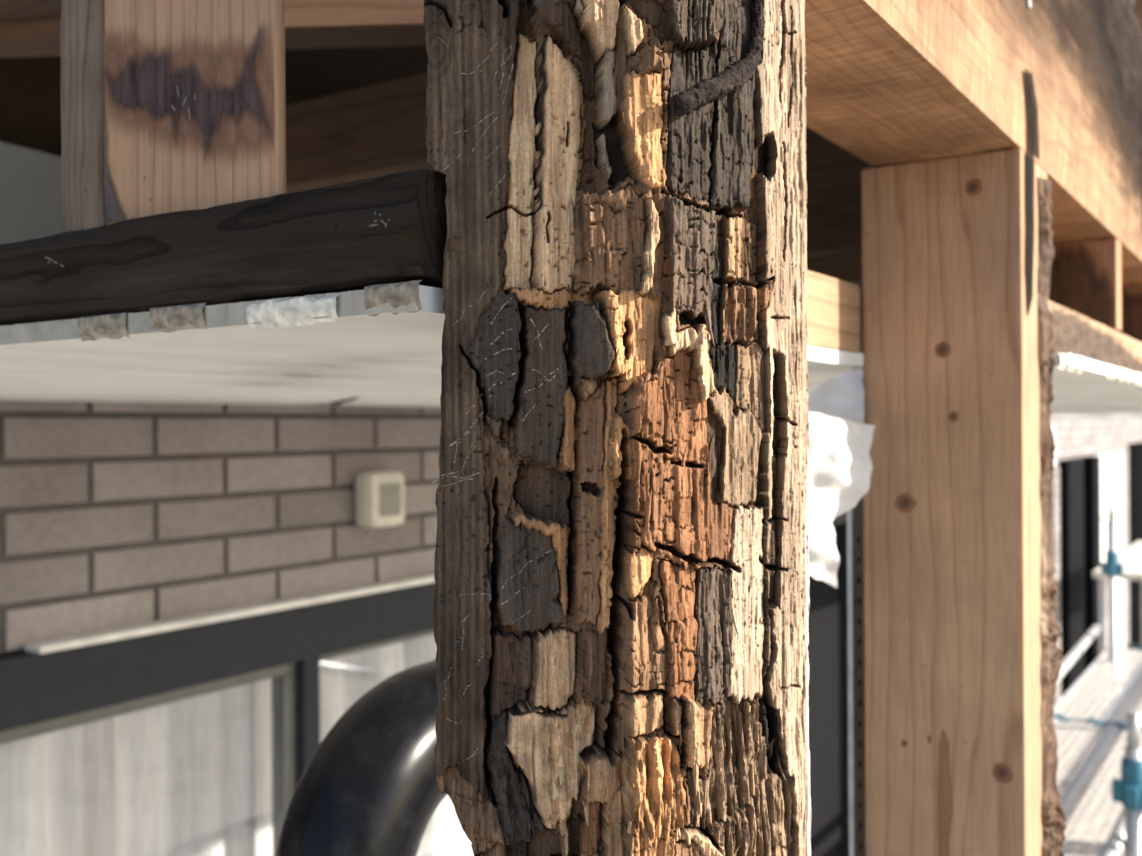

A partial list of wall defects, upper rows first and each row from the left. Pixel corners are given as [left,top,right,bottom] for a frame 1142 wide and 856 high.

water stain [103,32,274,223]
crack [488,0,571,243]
crack [660,100,742,218]
crack [712,0,797,290]
water stain [990,0,1142,203]
crack [459,299,531,427]
spalling [437,0,799,856]
crack [622,322,632,359]
crack [483,478,569,809]
crack [567,471,579,616]
crack [579,431,788,771]
crack [762,610,800,771]